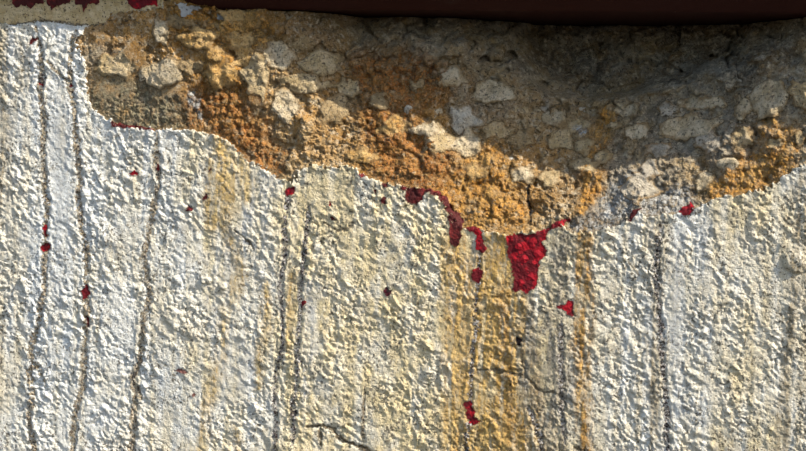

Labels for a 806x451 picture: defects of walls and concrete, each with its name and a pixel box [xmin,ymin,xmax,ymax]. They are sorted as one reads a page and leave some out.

rust [161,2,285,229]
crack [271,195,370,451]
spalling [0,0,806,294]
rust [346,50,539,451]
crack [462,250,586,451]
water stain [519,226,572,451]
rust [574,231,592,451]
rust [579,107,615,214]
water stain [575,171,690,233]